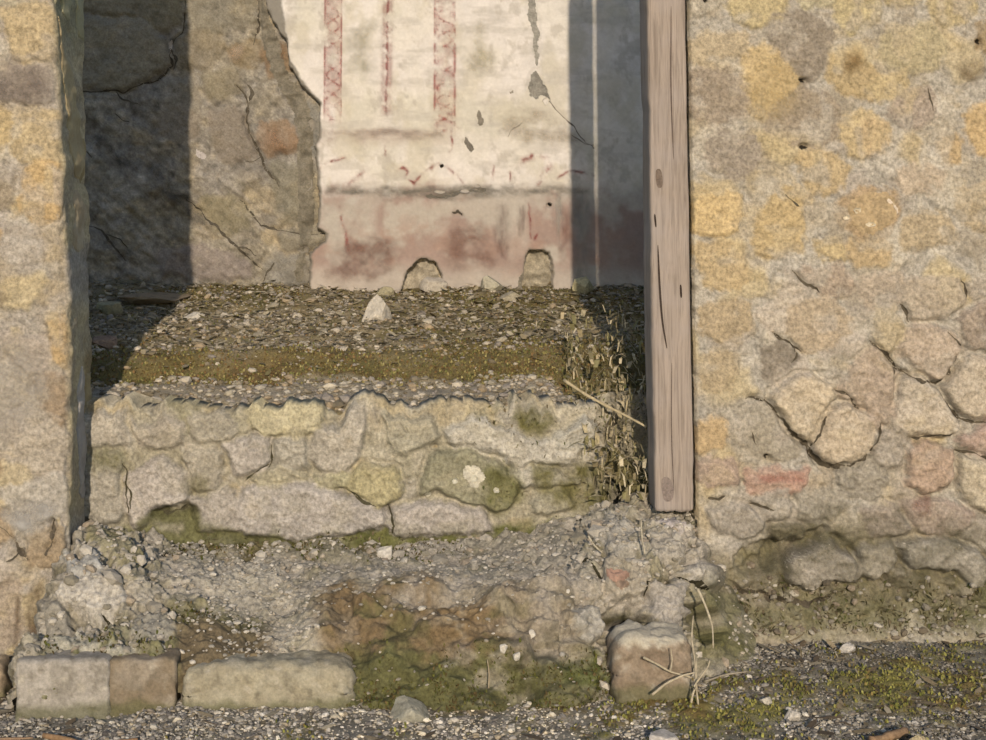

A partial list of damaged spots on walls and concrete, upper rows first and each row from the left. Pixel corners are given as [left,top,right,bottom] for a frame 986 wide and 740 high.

spalling [258,0,315,282]
crack [0,519,56,562]